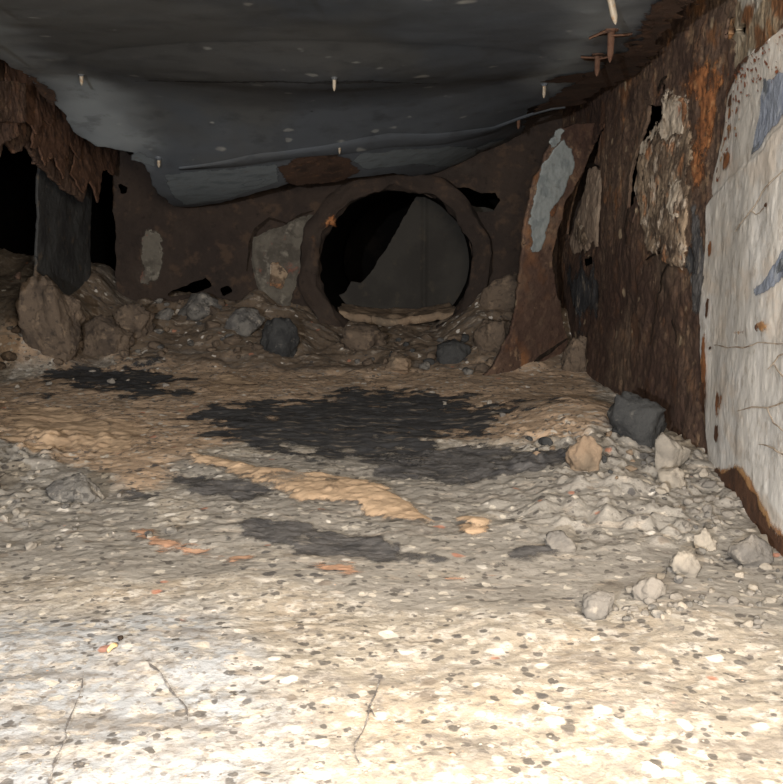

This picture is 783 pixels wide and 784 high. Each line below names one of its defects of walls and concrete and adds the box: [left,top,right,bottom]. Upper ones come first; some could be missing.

peeling [528,128,575,252]
spalling [569,166,602,254]
rust [522,0,700,121]
crack [624,75,667,241]
spalling [634,92,693,270]
rust [685,24,783,187]
peeling [751,72,783,154]
peeling [754,250,783,295]
rust [700,332,711,412]
crack [47,671,84,784]
crack [148,658,188,721]